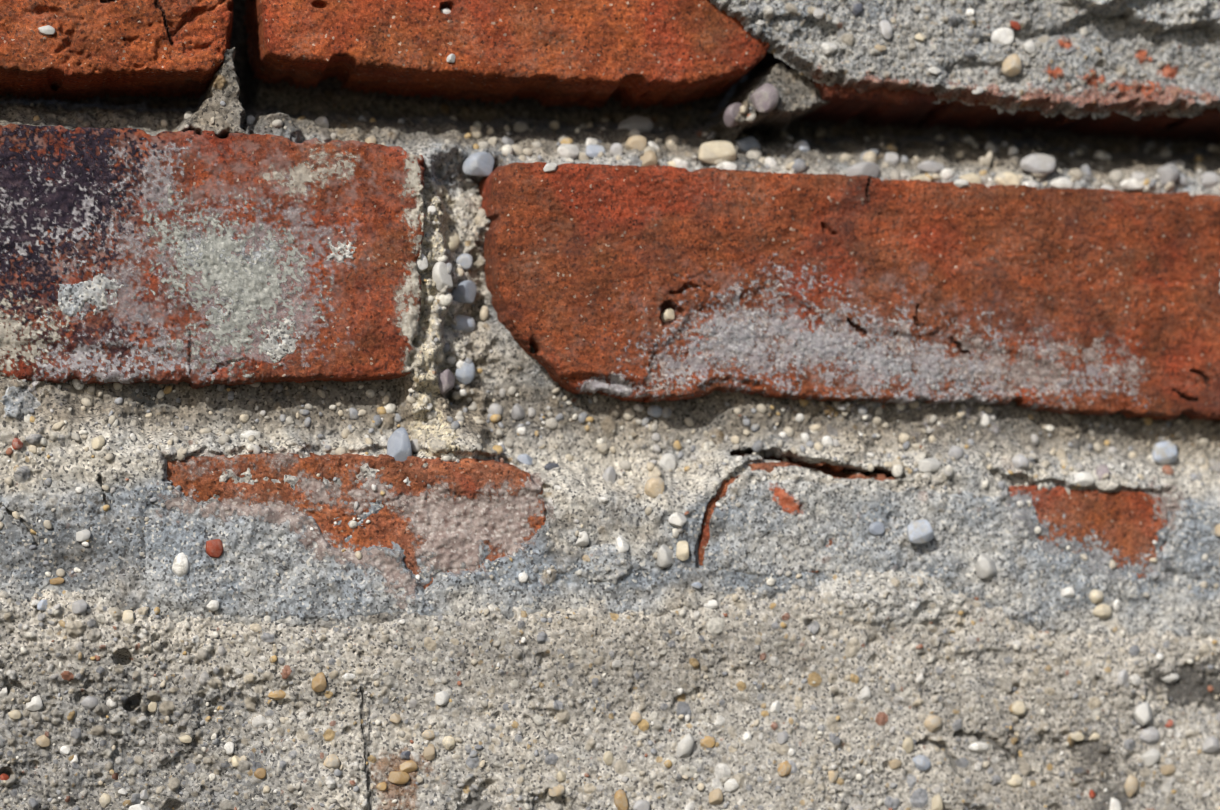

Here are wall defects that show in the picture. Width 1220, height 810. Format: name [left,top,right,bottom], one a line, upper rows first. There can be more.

crack [155,0,173,45]
crack [847,318,867,335]
crack [951,337,971,354]
crack [1172,370,1211,401]
crack [730,450,894,478]
peeling [297,462,409,516]